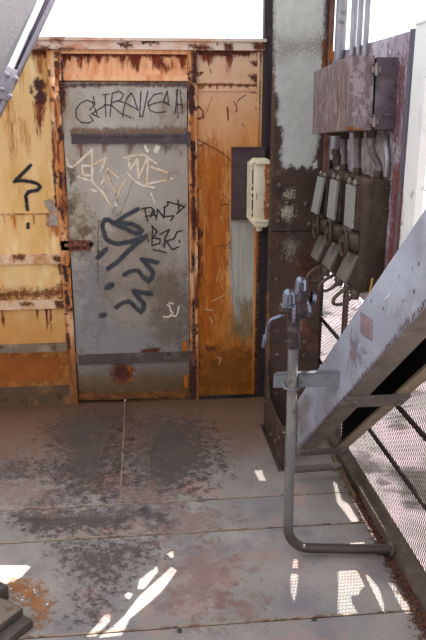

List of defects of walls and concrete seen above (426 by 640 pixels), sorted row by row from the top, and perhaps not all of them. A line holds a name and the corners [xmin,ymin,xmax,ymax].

peeling [273,0,326,170]
rust [30,42,266,220]
rust [182,140,232,351]
peeling [279,188,296,222]
rust [0,255,69,329]
rust [78,360,197,401]
damp [0,409,230,630]
rust [8,578,56,629]
rust [378,554,426,640]